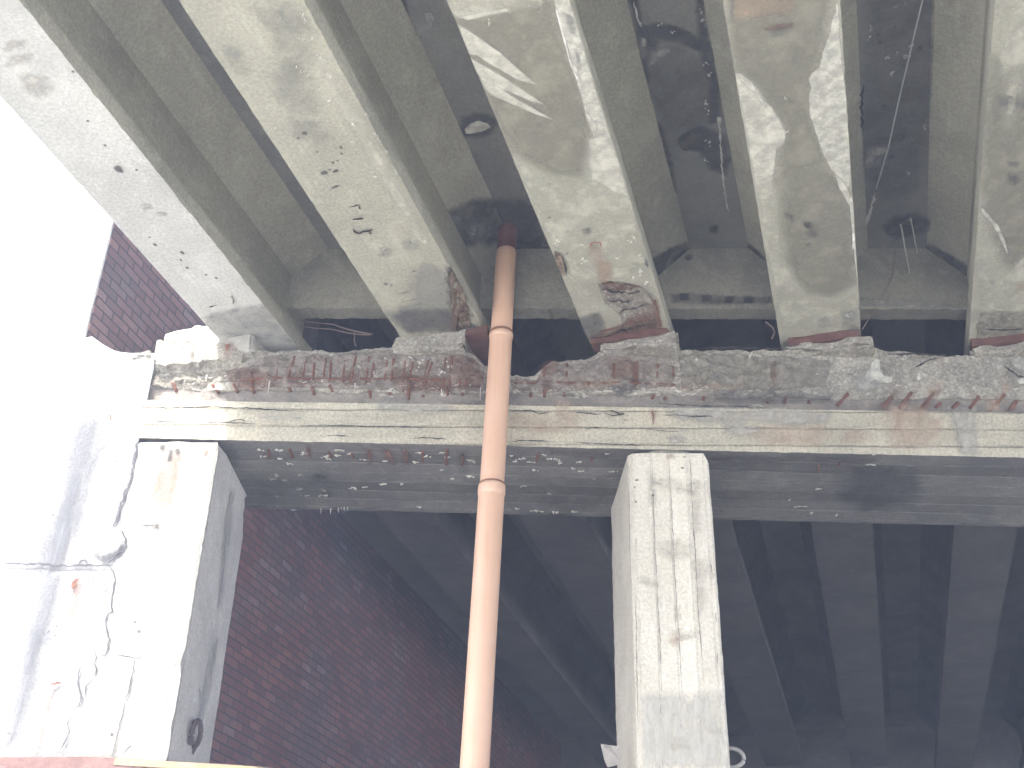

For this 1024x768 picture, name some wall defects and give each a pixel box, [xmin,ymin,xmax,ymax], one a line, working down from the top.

water stain [631,0,731,212]
water stain [836,175,876,296]
spalling [448,269,471,332]
spalling [598,281,662,338]
spalling [131,351,151,360]
spalling [151,350,484,400]
spalling [511,354,830,405]
spalling [920,391,980,410]
crack [0,406,444,756]